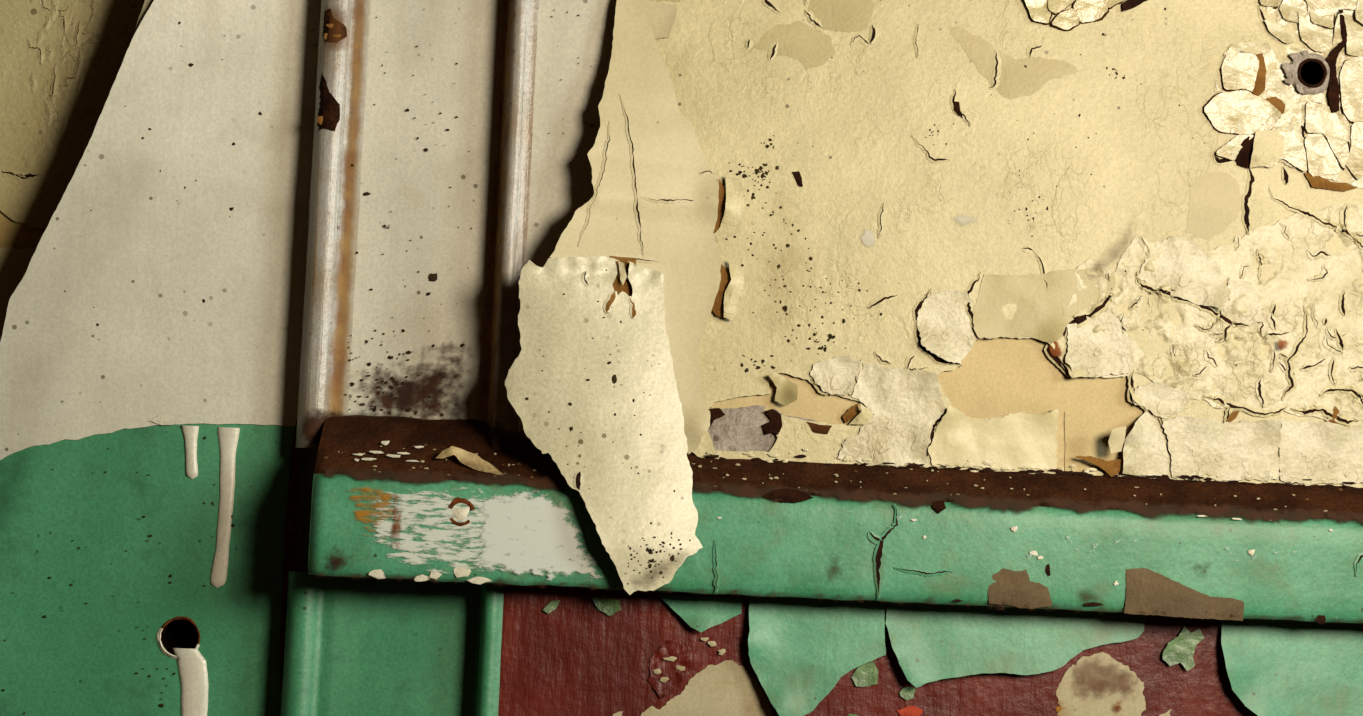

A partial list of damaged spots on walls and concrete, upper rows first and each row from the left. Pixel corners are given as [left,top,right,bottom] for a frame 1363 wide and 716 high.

peeling [0,246,37,341]
peeling [0,0,145,229]
spalling [150,413,177,425]
peeling [298,448,318,572]
corrosion [330,0,363,415]
peeling [505,0,1363,716]
crack [1022,125,1363,426]